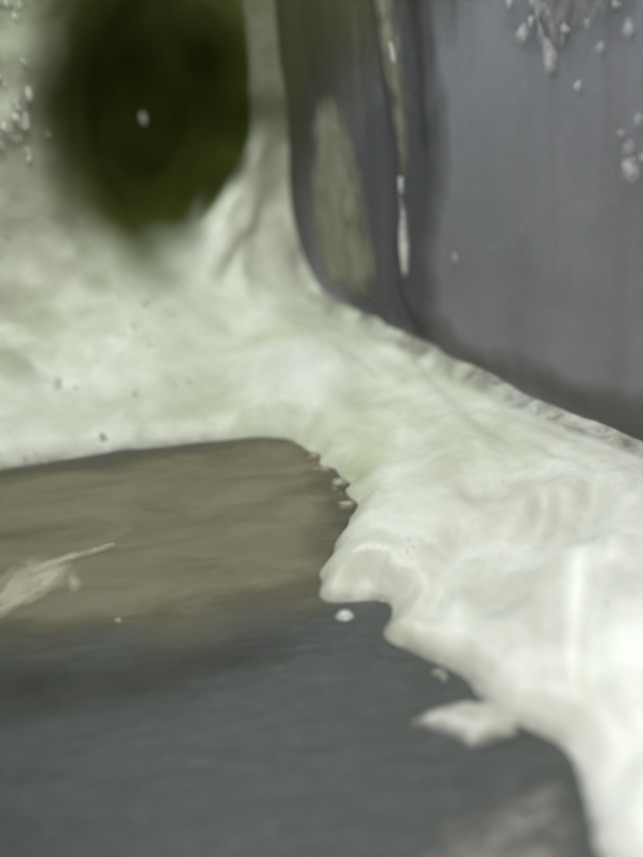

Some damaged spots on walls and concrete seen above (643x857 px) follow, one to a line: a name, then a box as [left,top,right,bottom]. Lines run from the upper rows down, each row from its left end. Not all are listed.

leakage [0,0,643,458]
leakage [0,316,643,857]